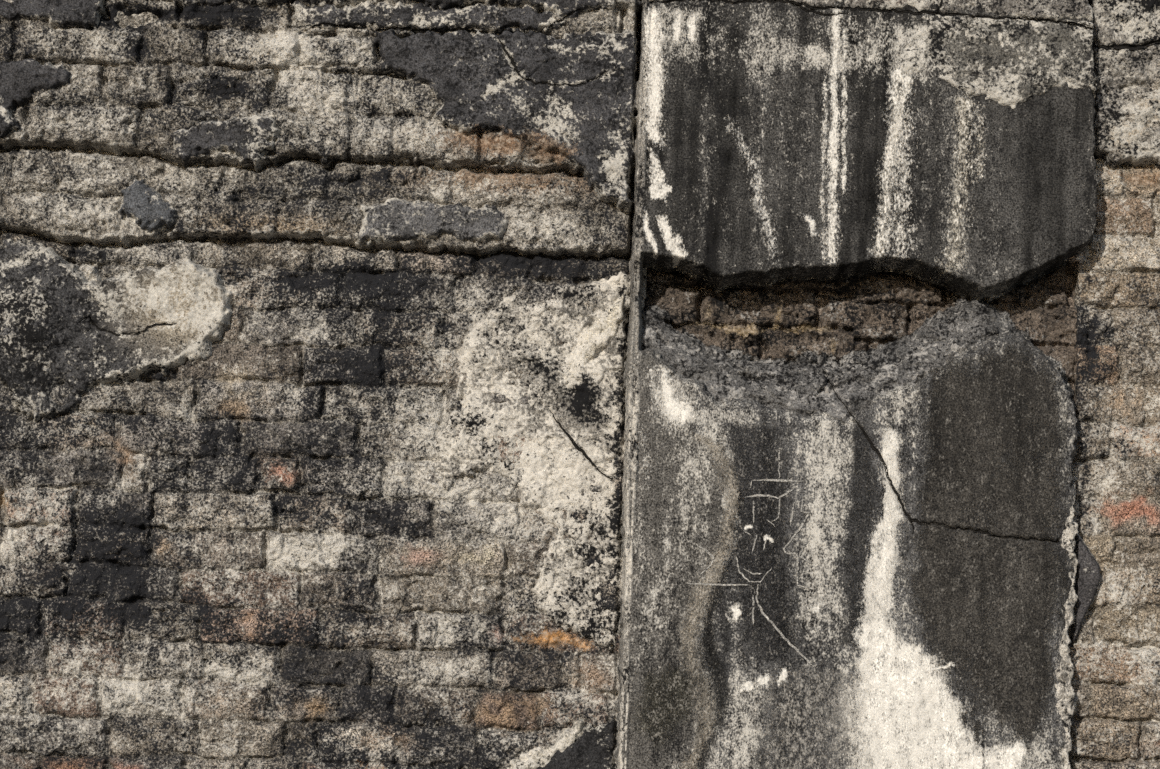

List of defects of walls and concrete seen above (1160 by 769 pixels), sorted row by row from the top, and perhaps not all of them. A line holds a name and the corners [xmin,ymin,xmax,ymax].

water stain [637,8,699,268]
water stain [724,118,777,256]
water stain [805,9,848,264]
water stain [867,68,917,267]
water stain [937,97,987,283]
crack [549,410,614,481]
spalling [433,263,1077,650]
water stain [631,337,1074,769]
crack [823,369,1059,542]
flaking render [507,718,618,769]